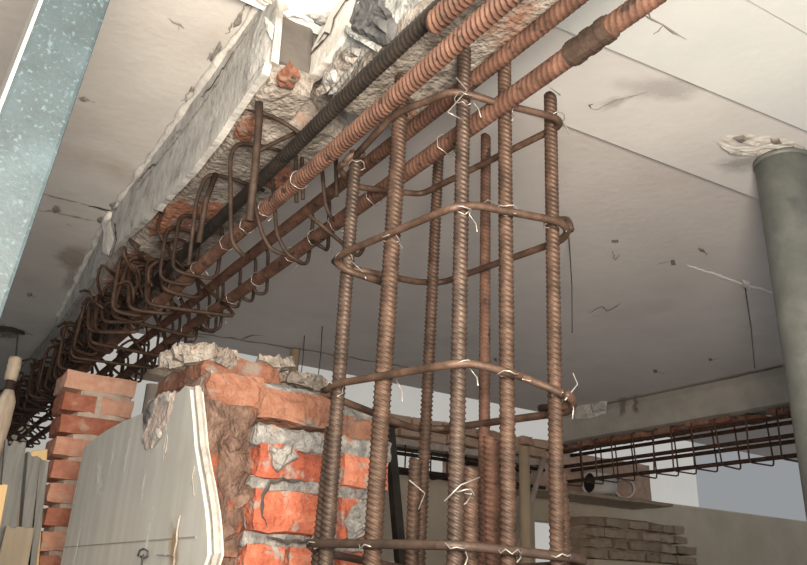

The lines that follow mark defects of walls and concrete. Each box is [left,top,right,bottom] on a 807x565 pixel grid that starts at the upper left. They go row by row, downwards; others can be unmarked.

flaking render [207,0,331,81]
spalling [316,0,397,96]
flaking render [276,60,301,90]
crack [589,92,647,110]
flaking render [233,117,255,142]
flaking render [717,133,804,159]
flaking render [148,197,224,236]
flaking render [97,217,145,284]
peeling [141,391,176,451]